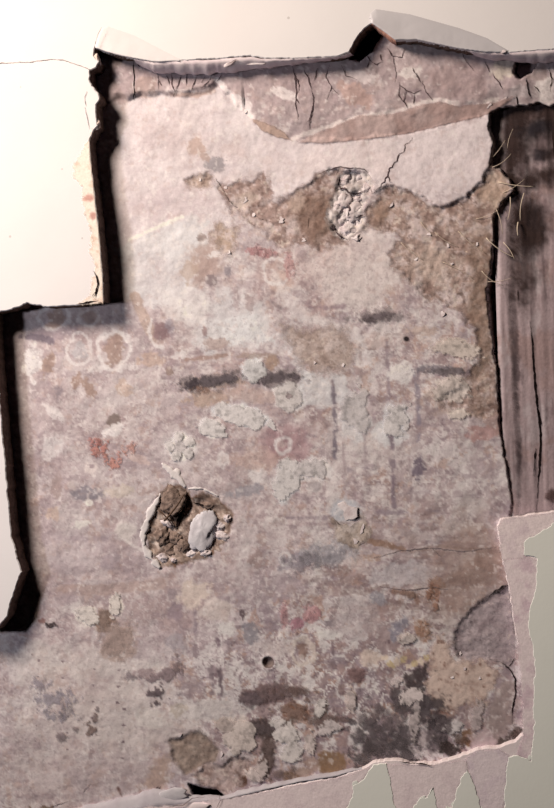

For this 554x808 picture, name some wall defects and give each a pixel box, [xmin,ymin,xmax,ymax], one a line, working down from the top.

crack [293,49,431,129]
crack [463,55,552,105]
crack [326,140,411,194]
leakage [504,104,554,304]
spalling [184,129,535,420]
spalling [139,401,276,569]
peeling [80,717,369,808]
leakage [252,719,295,783]
peeling [269,698,343,763]
leakage [238,663,468,768]